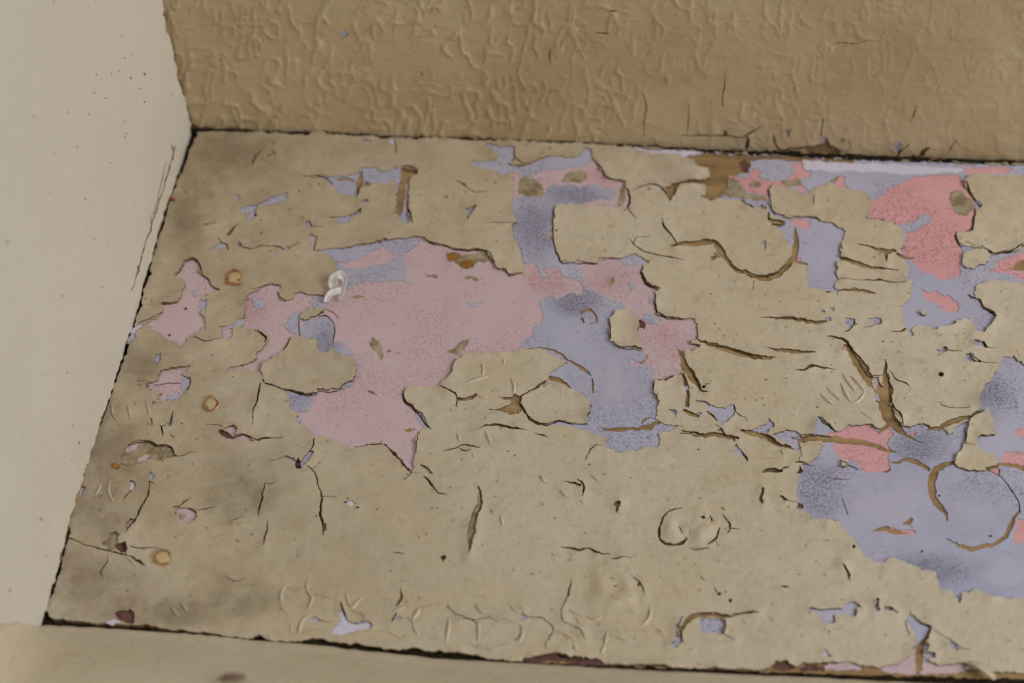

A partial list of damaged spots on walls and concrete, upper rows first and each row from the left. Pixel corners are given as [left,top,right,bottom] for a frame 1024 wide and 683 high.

crack [639,181,808,289]
peeling [633,117,1024,363]
peeling [121,354,191,466]
peeling [127,259,219,346]
peeling [219,144,701,472]
peeling [697,401,740,424]
crack [653,247,985,473]
crack [42,472,220,637]
crack [311,469,327,536]
crack [467,486,483,551]
peeling [781,357,1024,603]
crack [302,583,1024,683]